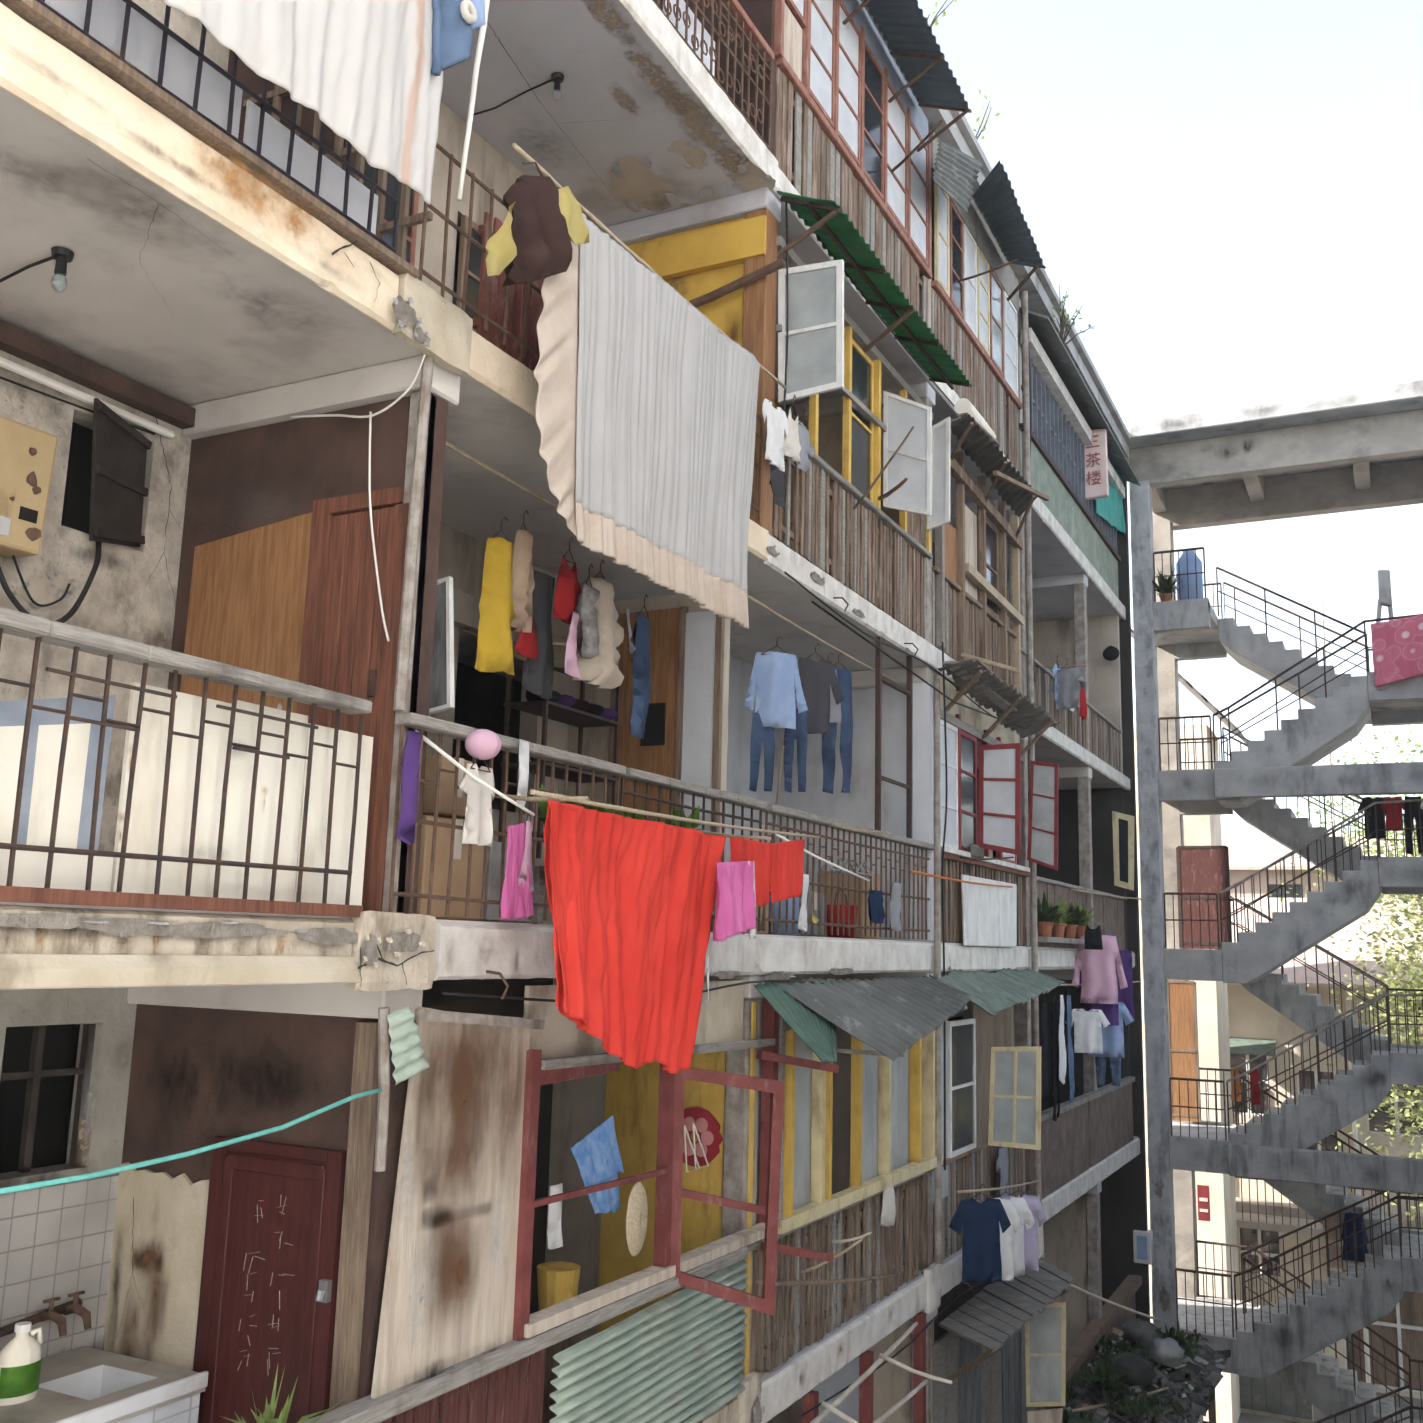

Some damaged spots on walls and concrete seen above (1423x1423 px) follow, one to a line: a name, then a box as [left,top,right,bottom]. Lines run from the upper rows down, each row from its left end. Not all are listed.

peeling [589,0,776,212]
spalling [392,295,431,348]
spalling [0,913,426,968]
damp [446,1048,475,1179]
damp [443,1241,469,1297]